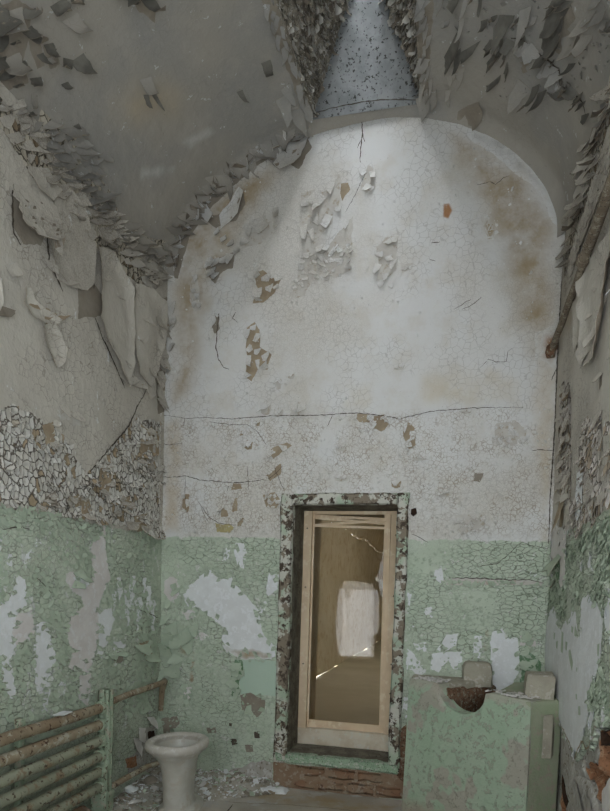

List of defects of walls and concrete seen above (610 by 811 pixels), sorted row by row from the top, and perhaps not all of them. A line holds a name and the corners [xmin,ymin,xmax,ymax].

peeling [359,165,375,193]
peeling [471,379,610,811]
peeling [403,588,463,677]
flaking render [125,712,182,773]
peeling [230,731,260,752]